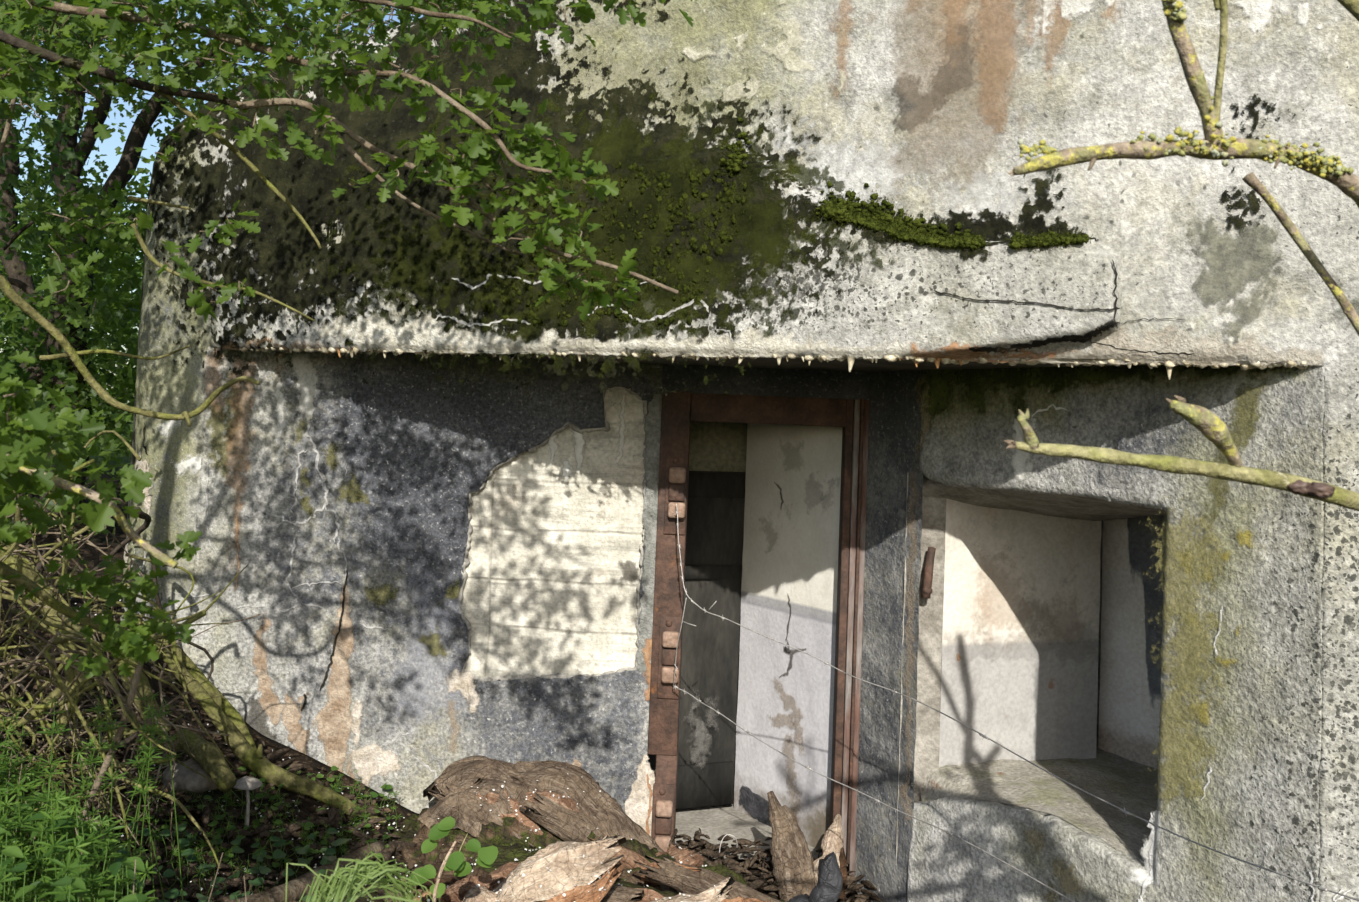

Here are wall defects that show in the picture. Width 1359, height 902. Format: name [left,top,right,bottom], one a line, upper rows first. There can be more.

corrosion [910,342,1056,362]
crack [933,260,1194,355]
crack [174,414,388,711]
peeling [446,387,662,713]
crack [779,596,806,678]
peeling [281,693,310,754]
peeling [346,699,401,786]
crack [1138,813,1155,902]